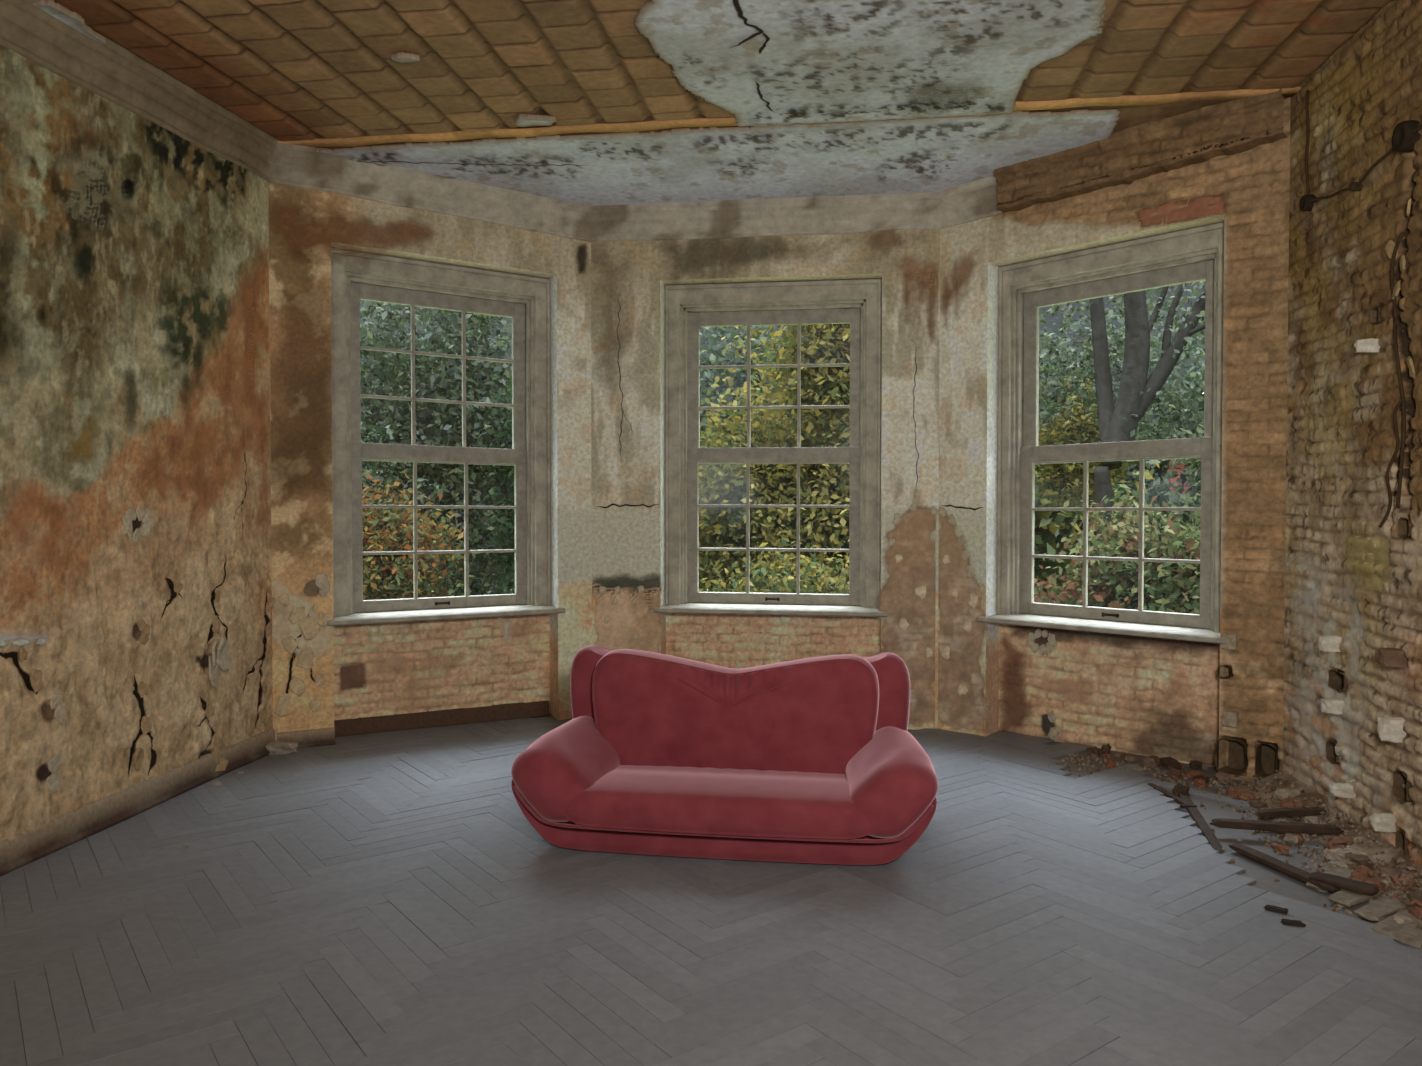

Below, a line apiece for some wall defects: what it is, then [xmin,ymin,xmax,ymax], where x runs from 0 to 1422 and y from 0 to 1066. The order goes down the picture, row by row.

leakage [145,123,247,193]
flaking render [316,0,1120,206]
crack [731,0,775,113]
leakage [578,245,586,272]
leakage [159,276,265,461]
crack [128,675,157,776]
crack [161,430,247,643]
crack [196,591,315,747]
leakage [594,575,661,592]
flaking render [879,503,988,731]
spalling [1042,710,1061,741]
peeling [1263,905,1306,927]